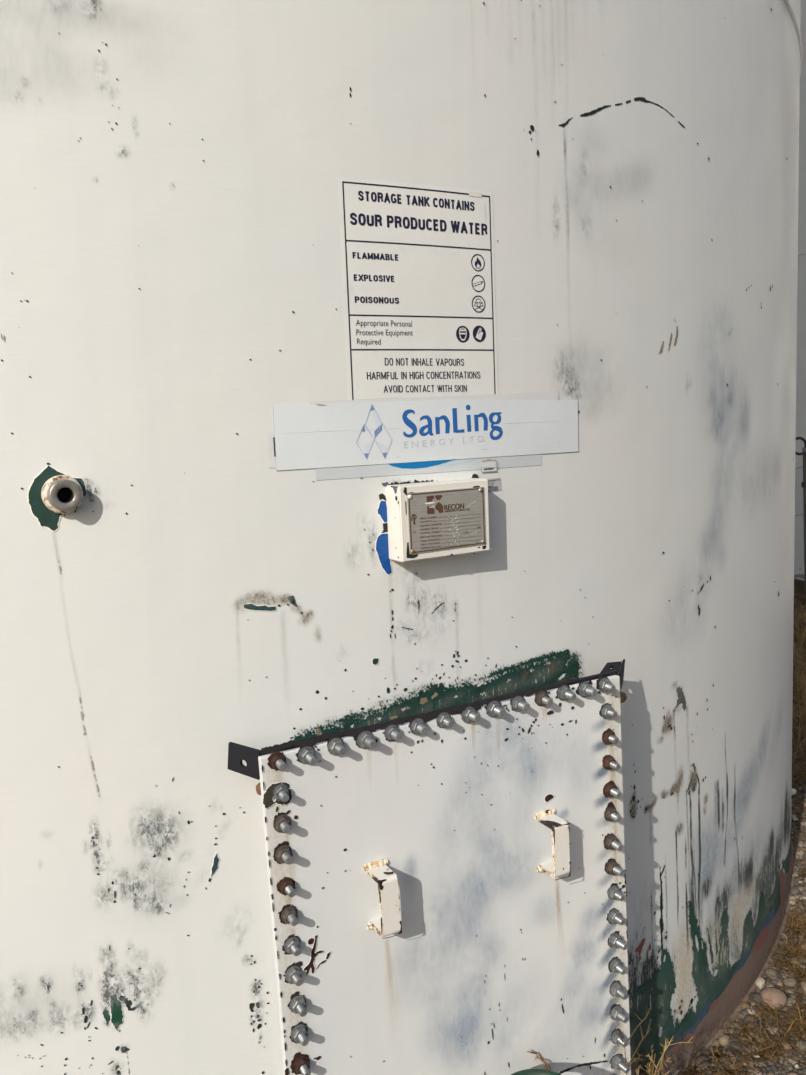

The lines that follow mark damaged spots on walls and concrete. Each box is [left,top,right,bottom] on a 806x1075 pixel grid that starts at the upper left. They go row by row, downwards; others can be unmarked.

crack [559,97,710,160]
peeling [21,463,97,532]
peeling [237,591,312,623]
peeling [687,763,707,803]
water stain [715,775,743,867]
peeling [205,826,220,889]
peeling [249,649,617,1075]
peeling [602,781,792,1075]